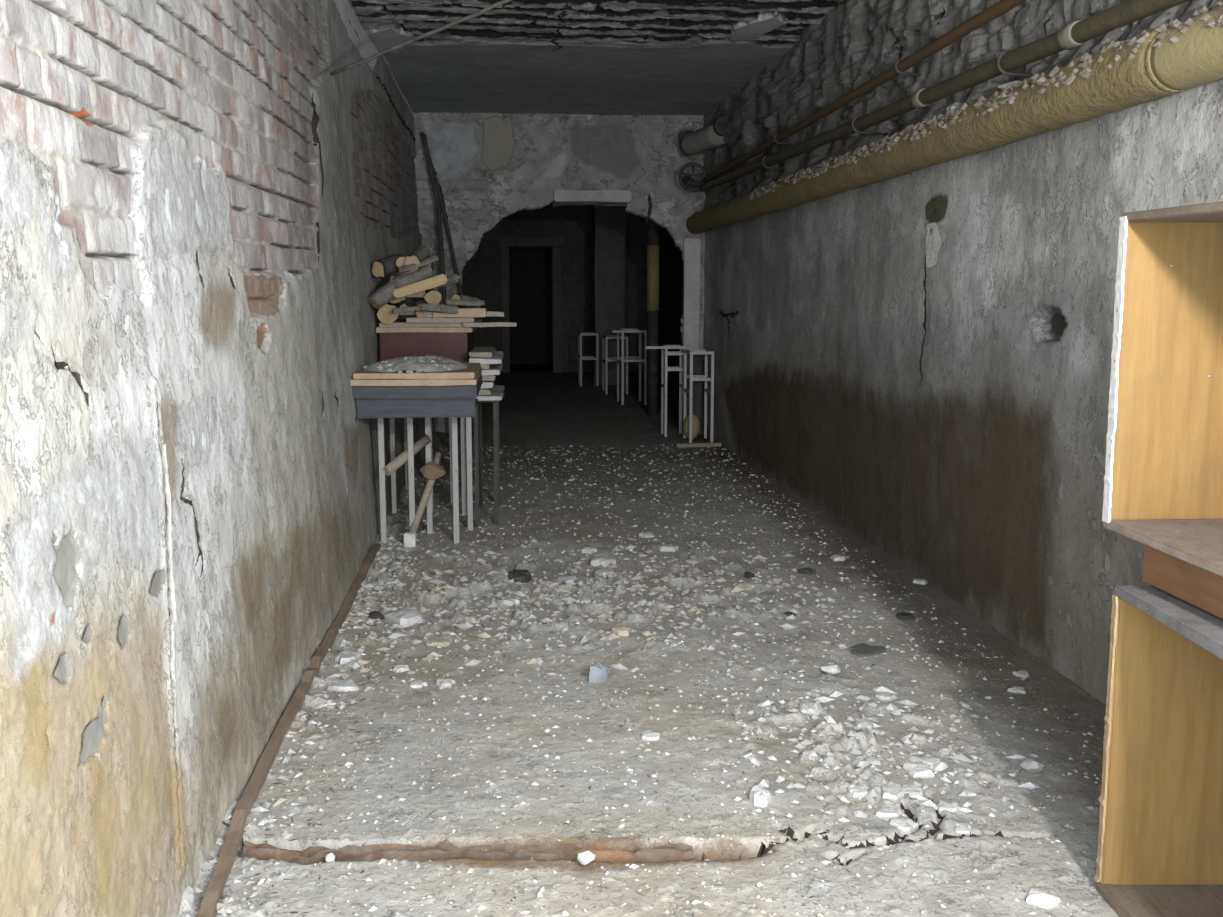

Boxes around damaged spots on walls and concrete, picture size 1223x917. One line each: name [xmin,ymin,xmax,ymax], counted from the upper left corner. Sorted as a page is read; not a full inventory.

crack [549,2,573,51]
crack [934,0,945,24]
peeling [151,127,229,263]
spalling [244,274,284,348]
crack [35,332,91,406]
crack [156,389,204,630]
peeling [12,449,163,673]
spalling [150,569,166,597]
spalling [78,691,112,766]
water stain [0,647,173,917]
rust [416,837,775,870]
crack [739,798,1022,866]